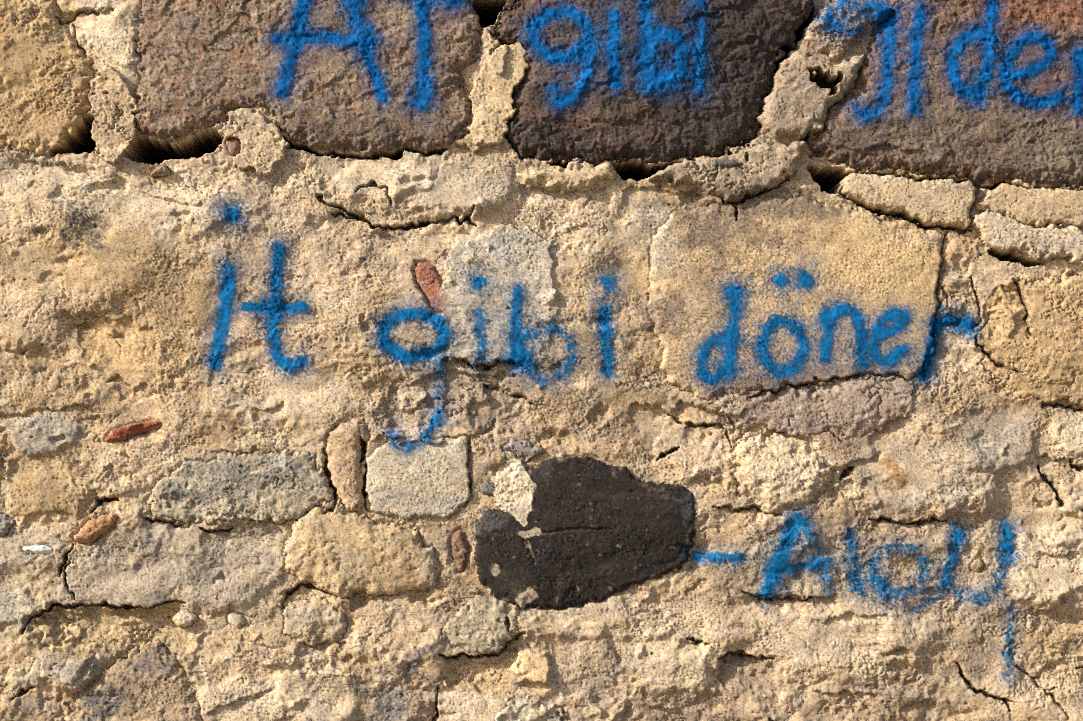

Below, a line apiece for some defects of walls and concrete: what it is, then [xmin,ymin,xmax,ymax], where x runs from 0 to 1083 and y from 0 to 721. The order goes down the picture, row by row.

crack [959,669,1010,710]